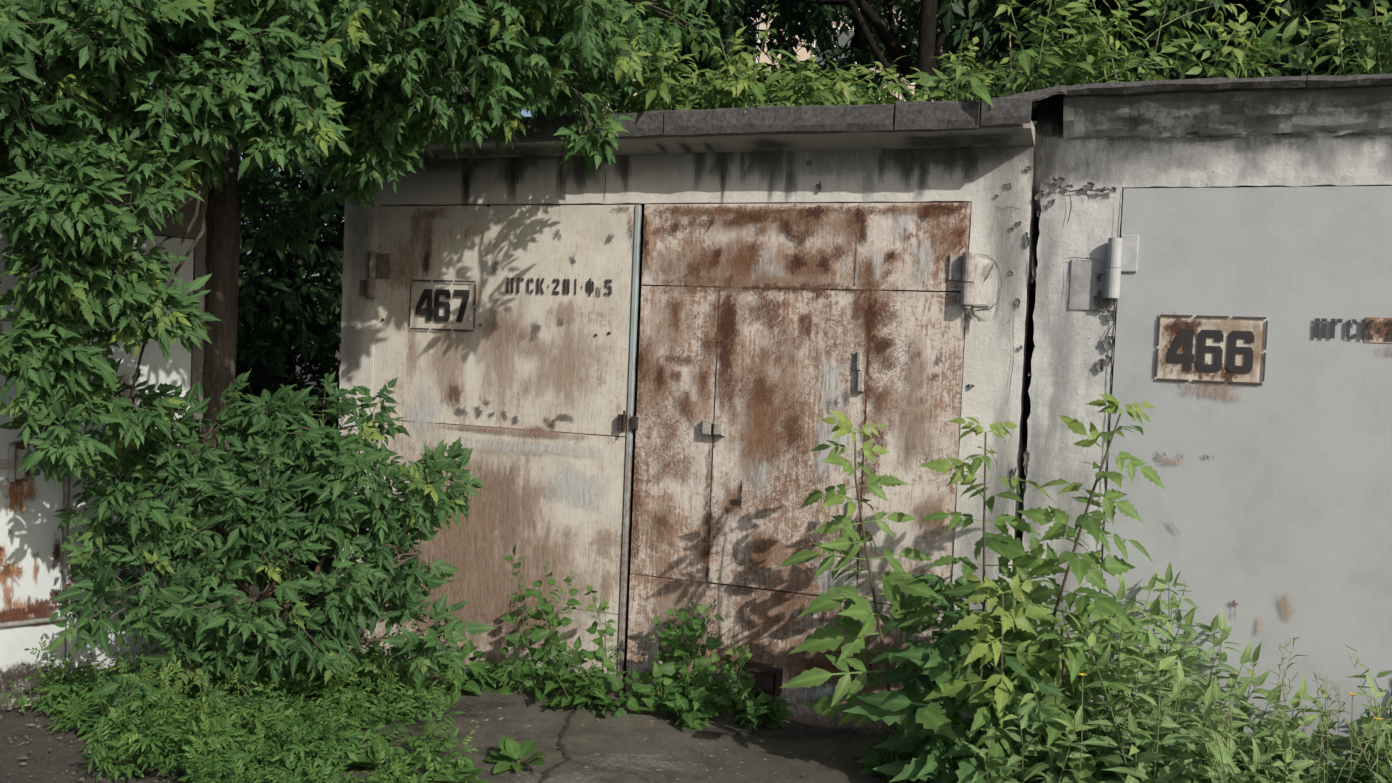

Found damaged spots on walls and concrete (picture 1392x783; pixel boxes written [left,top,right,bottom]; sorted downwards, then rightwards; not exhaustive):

water stain [505,148,594,195]
water stain [658,144,795,201]
rust [394,209,444,283]
rust [433,282,590,437]
rust [611,204,969,629]
rust [0,440,75,628]
rust [408,460,586,633]
rust [710,600,905,691]
crack [482,704,658,783]